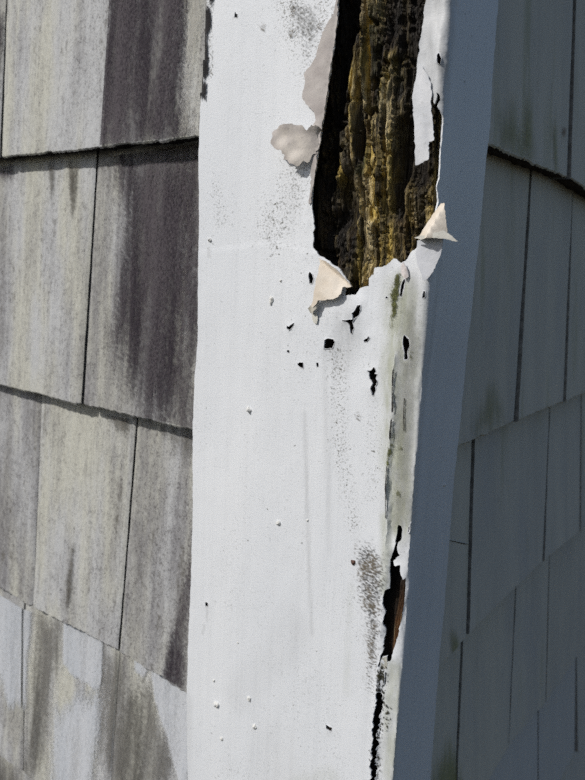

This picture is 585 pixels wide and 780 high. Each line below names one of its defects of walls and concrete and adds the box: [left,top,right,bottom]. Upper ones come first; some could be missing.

peeling [270,0,339,204]
peeling [412,65,434,165]
leakage [69,163,77,213]
leakage [100,0,213,457]
peeling [308,259,352,323]
peeling [415,203,458,281]
leakage [25,615,58,778]
leakage [64,548,73,604]
leakage [100,651,173,780]
leakage [163,531,192,689]
leakage [357,548,392,739]